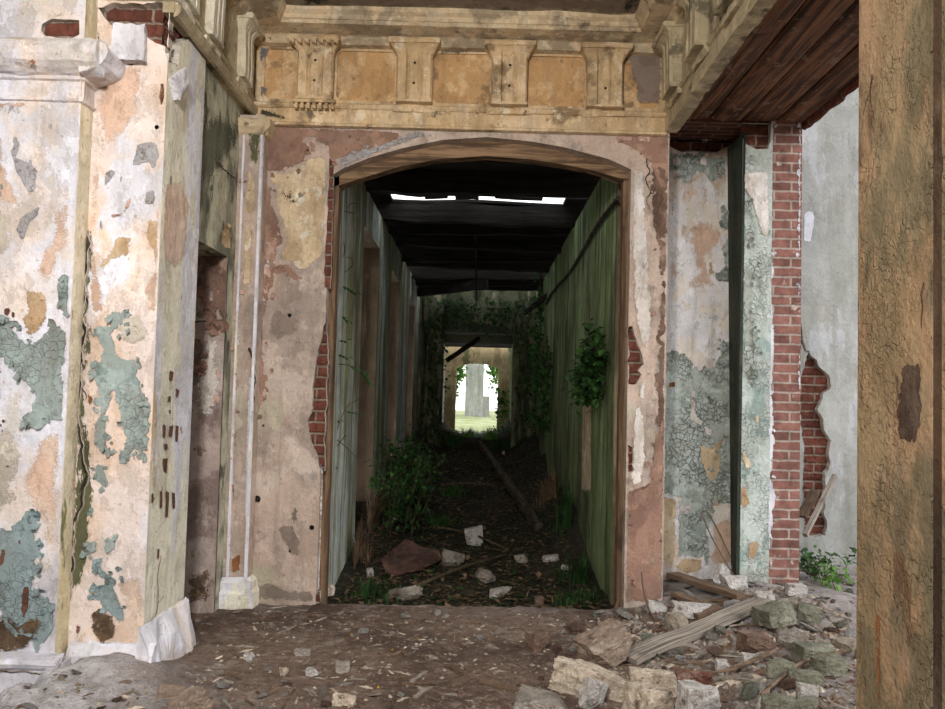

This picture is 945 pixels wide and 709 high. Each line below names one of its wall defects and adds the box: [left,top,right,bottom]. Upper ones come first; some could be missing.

flaking render [0,138,17,254]
peeling [0,185,69,651]
peeling [88,182,189,492]
peeling [193,127,431,420]
spalling [307,322,329,471]
peeling [618,136,750,602]
flaking render [749,541,759,559]
peeling [743,172,771,387]
spalling [741,124,777,149]
spalling [800,353,831,537]